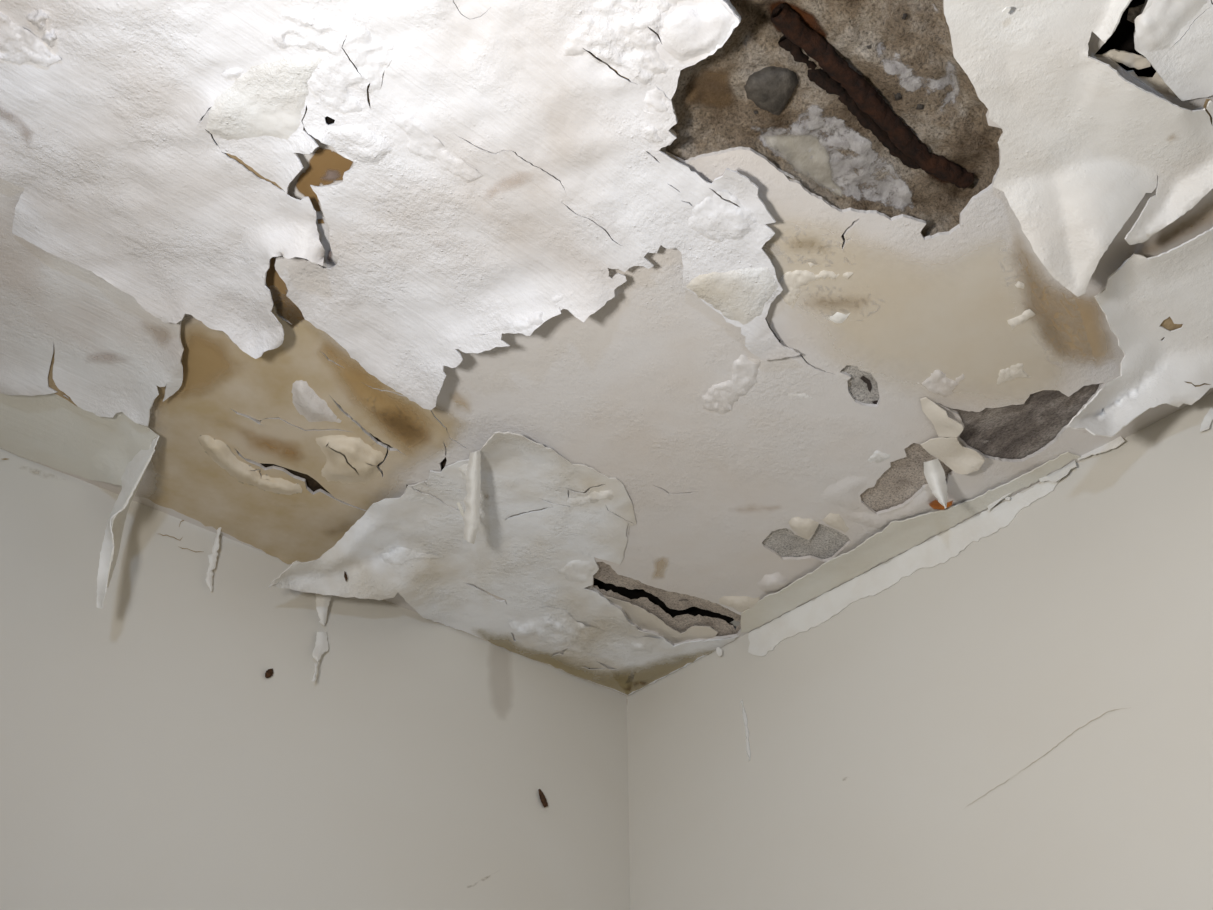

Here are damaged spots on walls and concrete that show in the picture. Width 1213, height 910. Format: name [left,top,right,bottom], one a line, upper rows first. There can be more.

crack [1096,0,1176,96]
crack [1203,99,1212,124]
peeling [0,0,1213,695]
leakage [149,257,458,564]
crack [260,463,330,494]
crack [593,578,734,623]